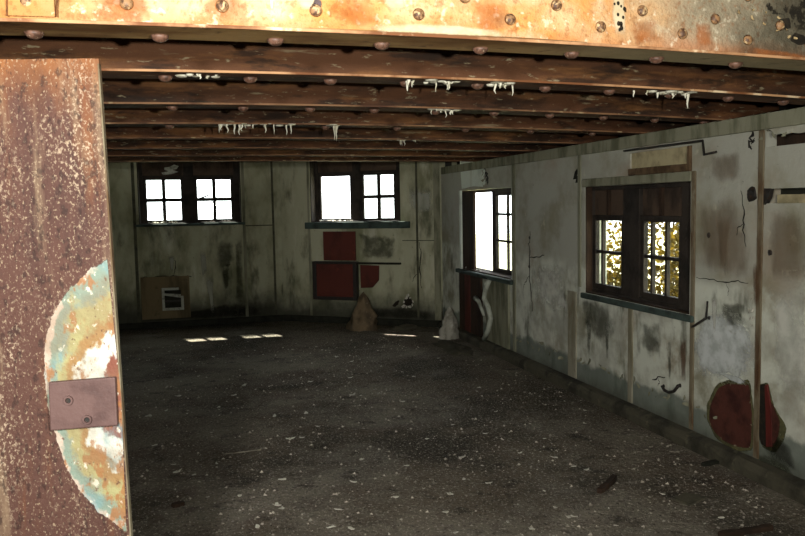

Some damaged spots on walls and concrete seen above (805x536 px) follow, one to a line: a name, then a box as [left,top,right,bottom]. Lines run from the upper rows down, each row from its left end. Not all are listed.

damp [405,79,460,91]
damp [486,81,515,96]
efflorescence [646,90,697,108]
damp [218,123,295,135]
spalling [682,379,786,452]